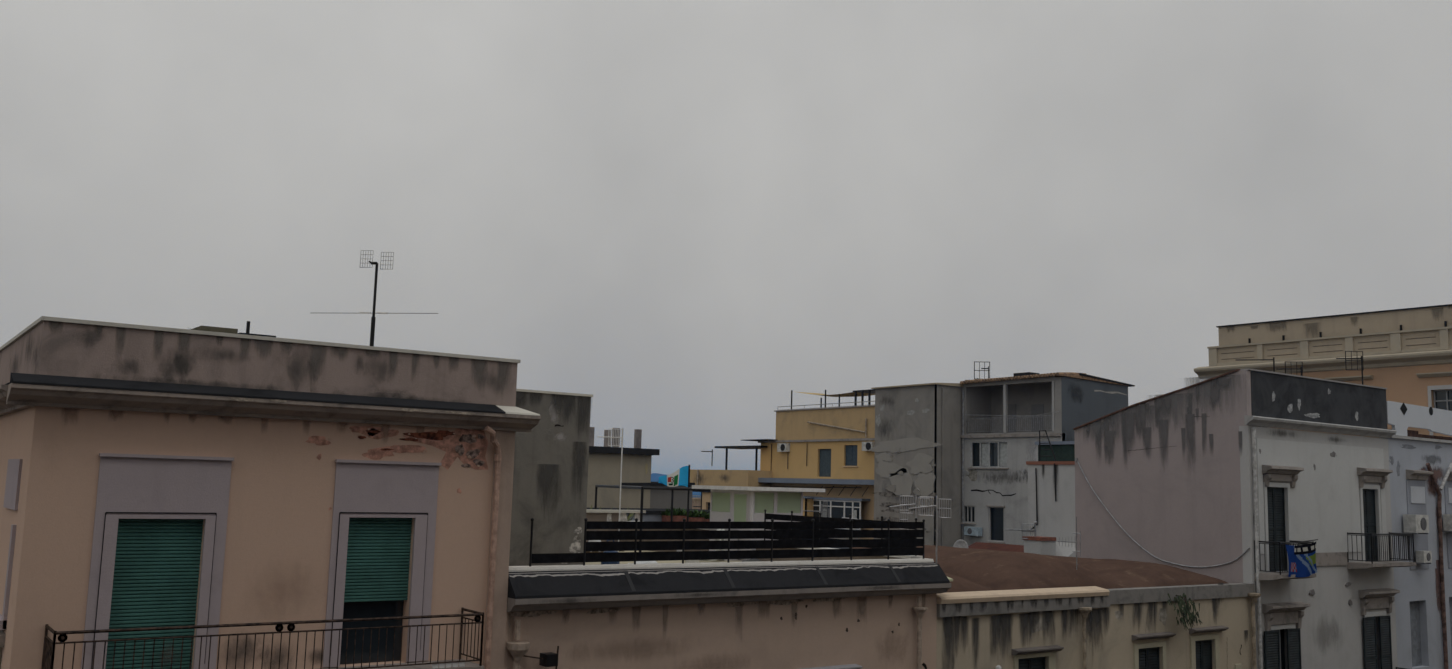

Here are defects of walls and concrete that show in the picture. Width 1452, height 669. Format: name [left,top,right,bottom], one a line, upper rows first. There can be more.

damp [86,325,125,345]
damp [155,330,225,387]
damp [241,338,292,354]
damp [311,344,346,369]
peeling [349,426,489,470]
damp [366,349,591,508]
damp [1030,445,1058,482]
damp [1084,375,1234,459]
damp [922,594,1166,669]